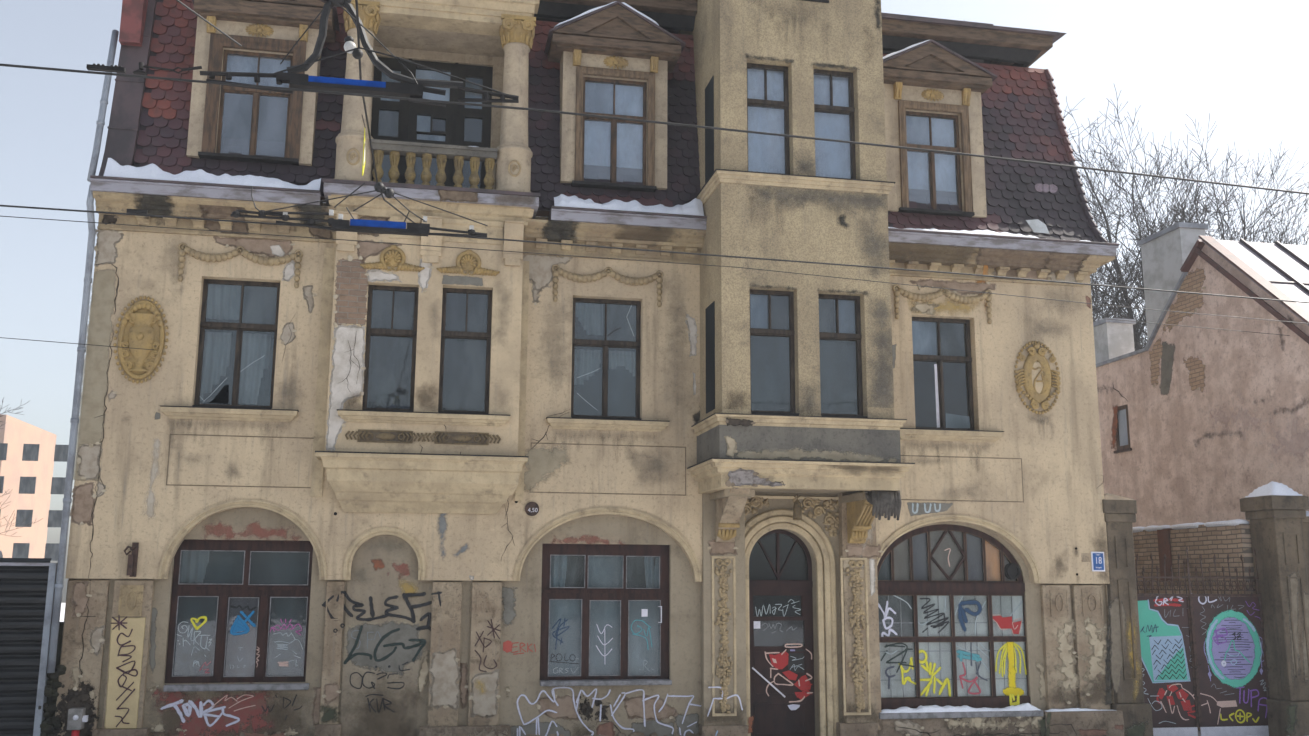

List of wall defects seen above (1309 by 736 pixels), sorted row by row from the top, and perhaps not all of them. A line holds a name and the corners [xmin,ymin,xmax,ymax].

water stain [762,188,884,227]
peeling [418,259,434,292]
peeling [523,254,573,305]
peeling [326,216,402,451]
water stain [829,290,893,408]
flaking render [1149,268,1206,392]
flaking render [724,418,786,487]
flaking render [70,482,107,526]
peeling [416,648,510,719]